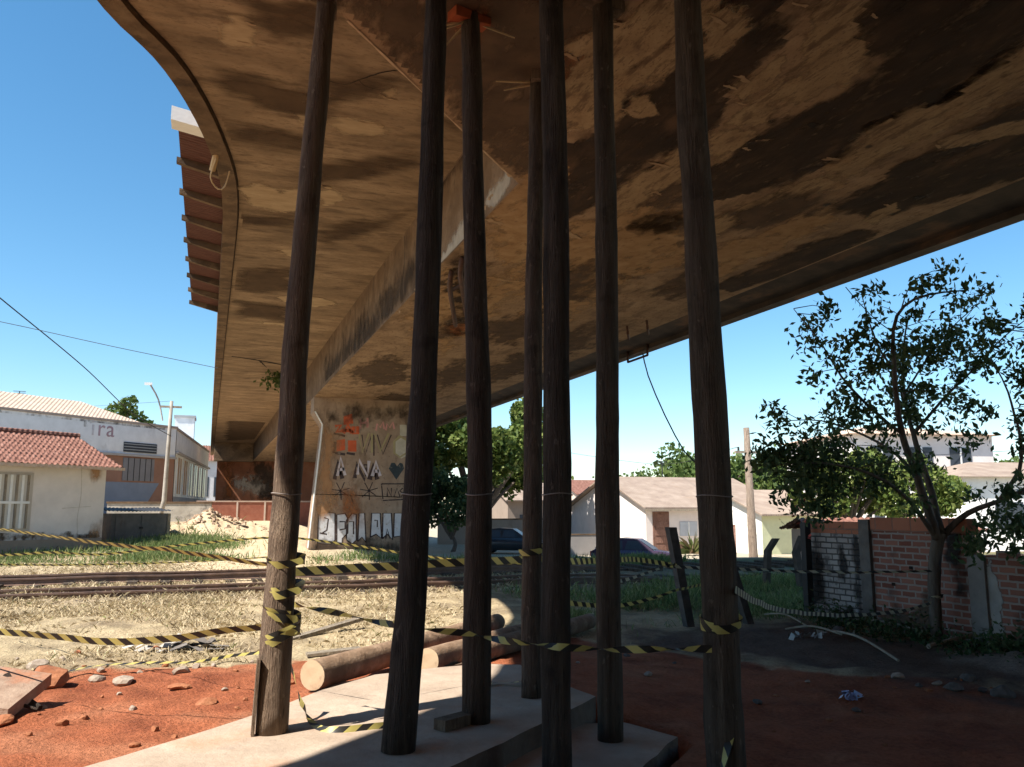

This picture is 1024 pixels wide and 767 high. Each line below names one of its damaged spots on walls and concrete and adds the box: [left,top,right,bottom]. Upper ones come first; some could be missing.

water stain [567,133,595,218]
water stain [615,70,678,190]
water stain [702,0,1024,230]
water stain [619,183,684,291]
water stain [719,230,880,292]
water stain [325,236,416,425]